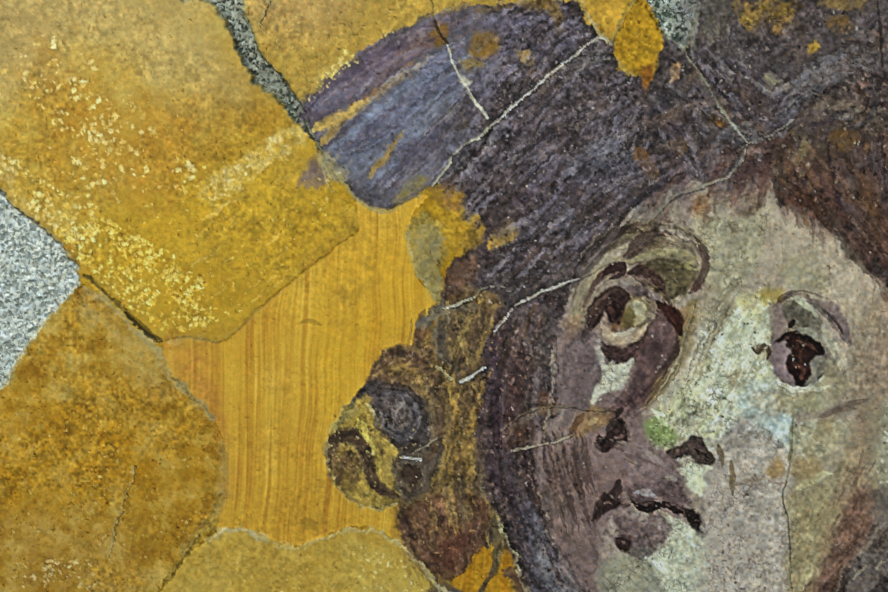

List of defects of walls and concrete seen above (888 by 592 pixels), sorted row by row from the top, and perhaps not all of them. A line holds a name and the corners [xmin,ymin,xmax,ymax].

flaking render [0,34,218,392]
flaking render [172,0,309,206]
crack [443,260,616,333]
crack [431,0,636,187]
flaking render [647,0,699,52]
crack [646,53,794,225]
crack [782,415,795,592]